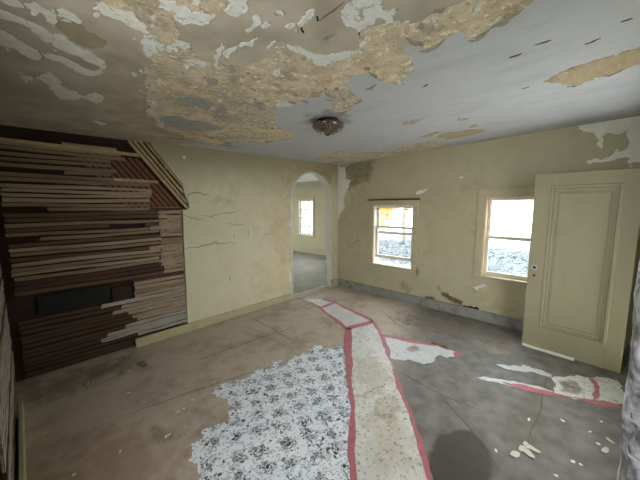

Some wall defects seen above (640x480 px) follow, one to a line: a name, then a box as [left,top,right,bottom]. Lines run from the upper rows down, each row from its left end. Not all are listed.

peeling [0,0,107,76]
peeling [18,71,104,103]
flaking render [93,0,534,146]
flaking render [544,47,640,86]
flaking render [312,117,486,219]
peeling [579,116,640,167]
crack [183,192,249,249]